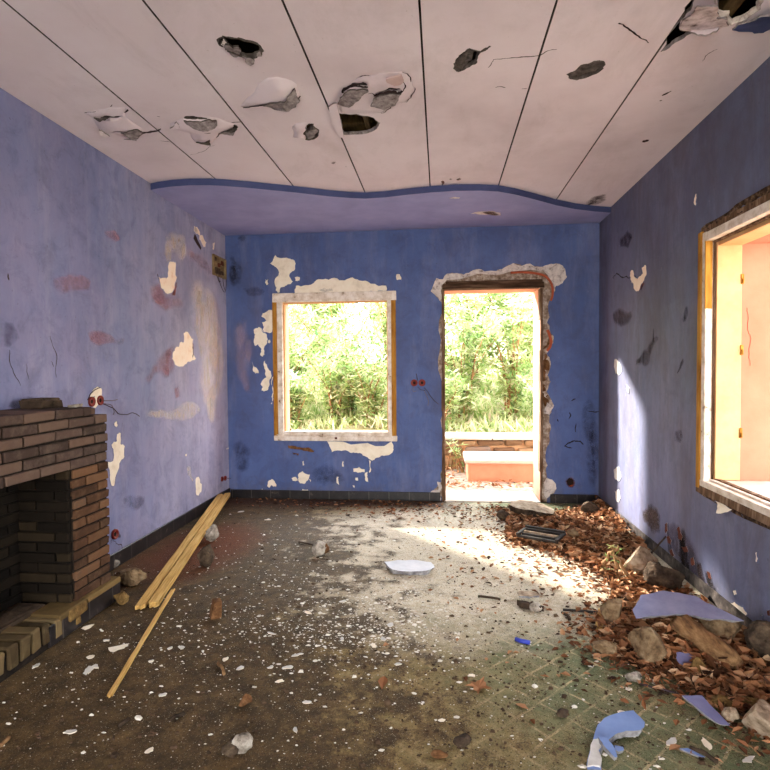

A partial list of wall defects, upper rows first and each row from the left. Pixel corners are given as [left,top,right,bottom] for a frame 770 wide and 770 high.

peeling [679,5,770,36]
peeling [221,37,255,66]
peeling [157,261,177,295]
peeling [264,255,388,293]
peeling [630,264,647,292]
peeling [172,331,196,368]
peeling [251,309,274,405]
flaking render [431,263,567,502]
peeling [107,420,125,487]
peeling [327,441,394,488]